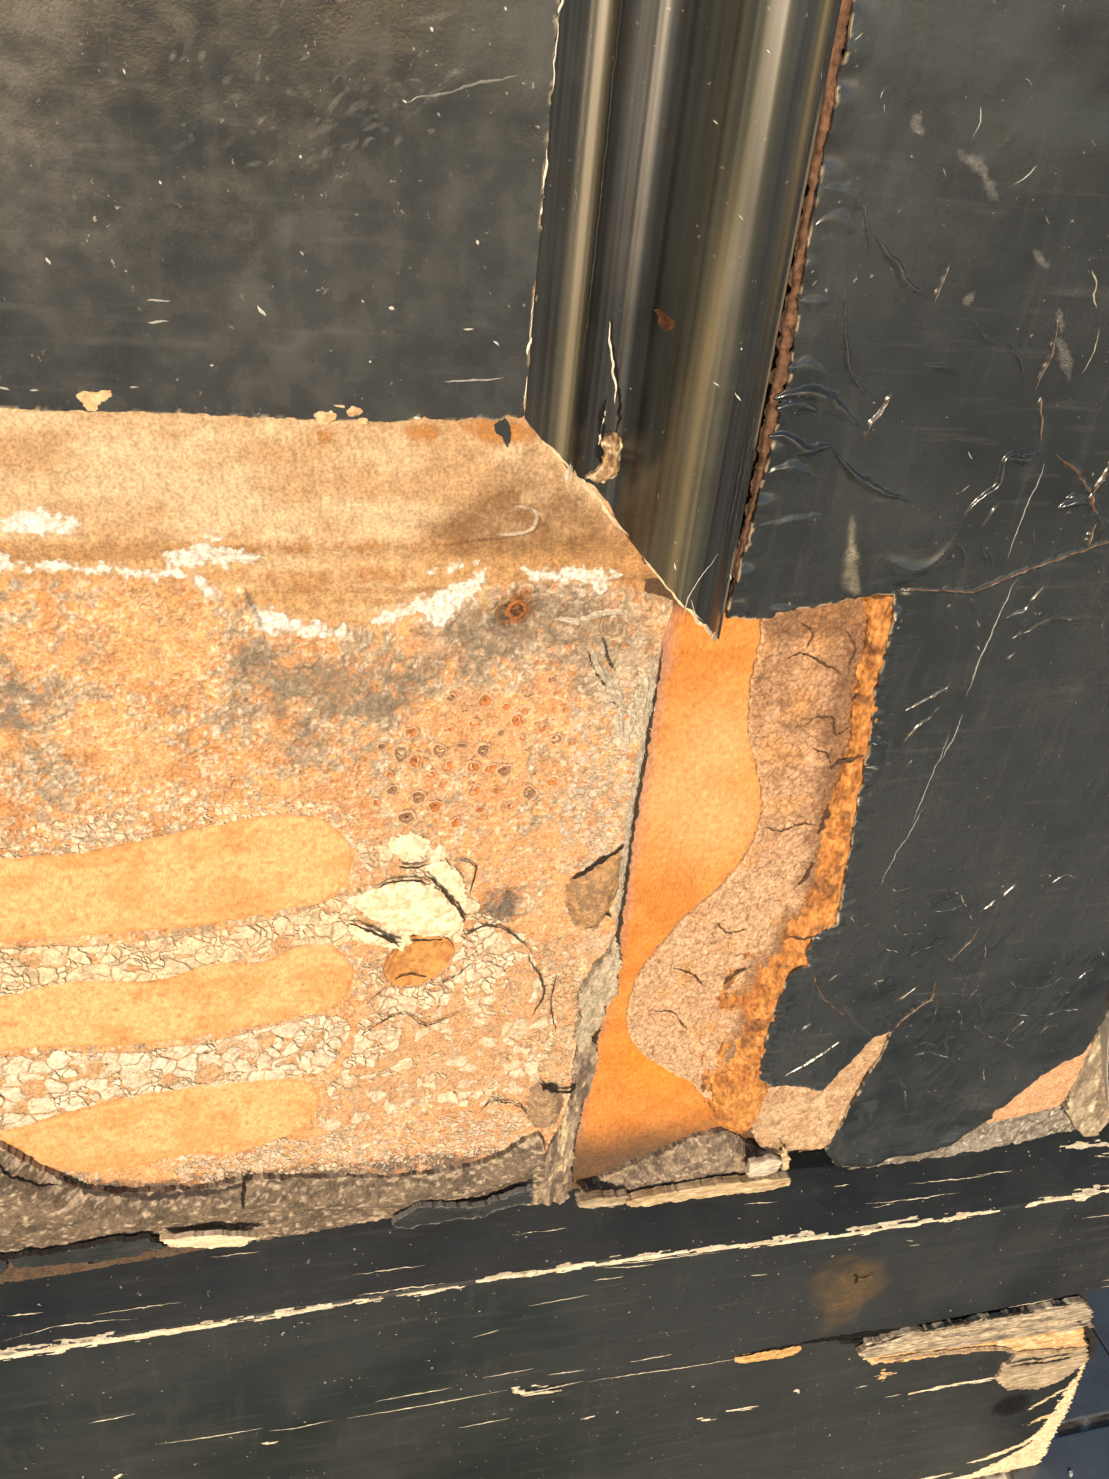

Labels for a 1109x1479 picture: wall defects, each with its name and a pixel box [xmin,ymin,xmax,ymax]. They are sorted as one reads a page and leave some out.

water stain [0,506,82,537]
water stain [0,533,263,599]
water stain [370,477,596,628]
rust [483,582,536,626]
efflorescence [521,565,623,595]
crack [895,319,1109,595]
peeling [0,798,581,1183]
crack [359,859,557,1037]
crack [572,636,663,945]
peeling [626,594,893,1154]
peeling [0,1171,1010,1361]
peeling [922,1363,1086,1479]